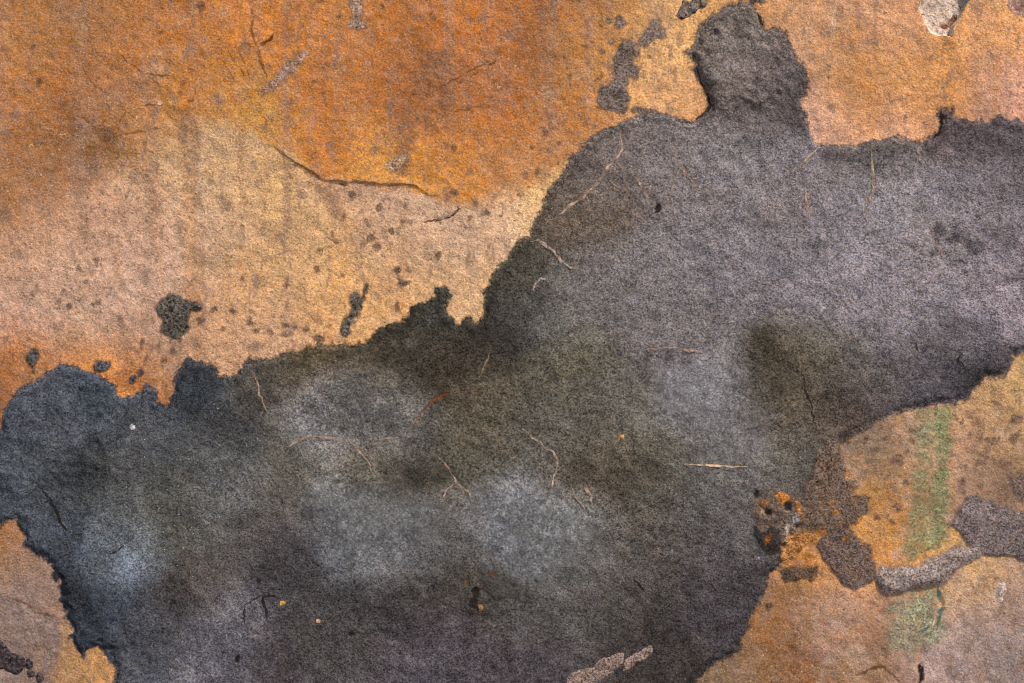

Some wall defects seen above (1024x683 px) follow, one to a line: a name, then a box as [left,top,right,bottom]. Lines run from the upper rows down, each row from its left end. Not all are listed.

damp [822,113,1024,171]
crack [275,144,459,223]
damp [931,226,982,265]
damp [733,333,1017,463]
damp [0,238,767,683]